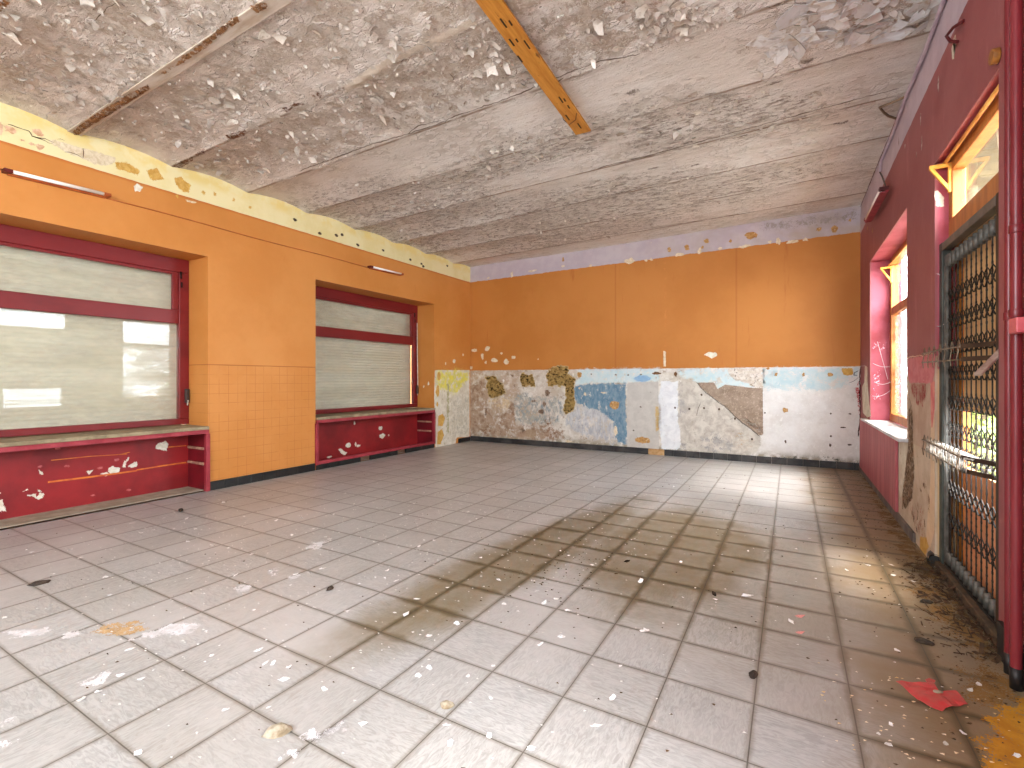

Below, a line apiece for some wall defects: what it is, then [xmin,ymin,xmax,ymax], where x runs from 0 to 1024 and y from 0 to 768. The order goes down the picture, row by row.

peeling [504,0,941,78]
crack [8,124,84,157]
peeling [0,0,862,267]
peeling [86,457,137,474]
flaking render [423,346,516,447]
flaking render [520,365,576,415]
flaking render [678,367,778,455]
flaking render [898,353,935,532]